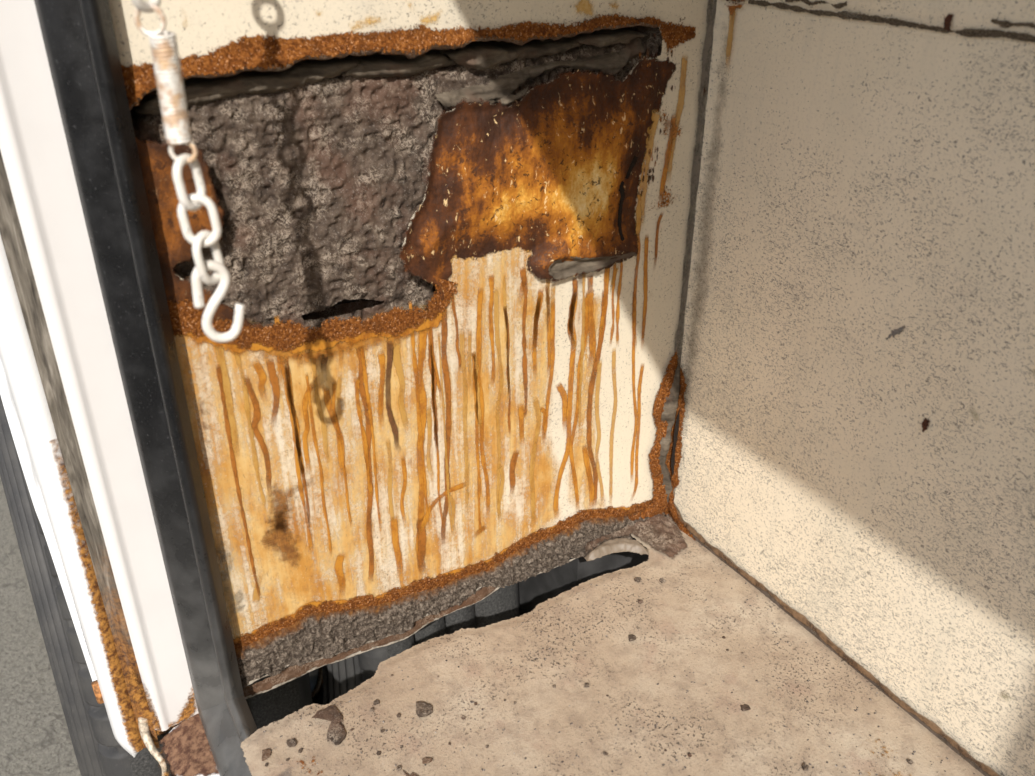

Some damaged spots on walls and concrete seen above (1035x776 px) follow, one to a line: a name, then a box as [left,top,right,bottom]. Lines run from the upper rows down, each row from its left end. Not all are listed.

corrosion [51,439,219,776]
corrosion [121,12,696,639]
corrosion [233,0,1000,776]
crack [748,0,1035,43]